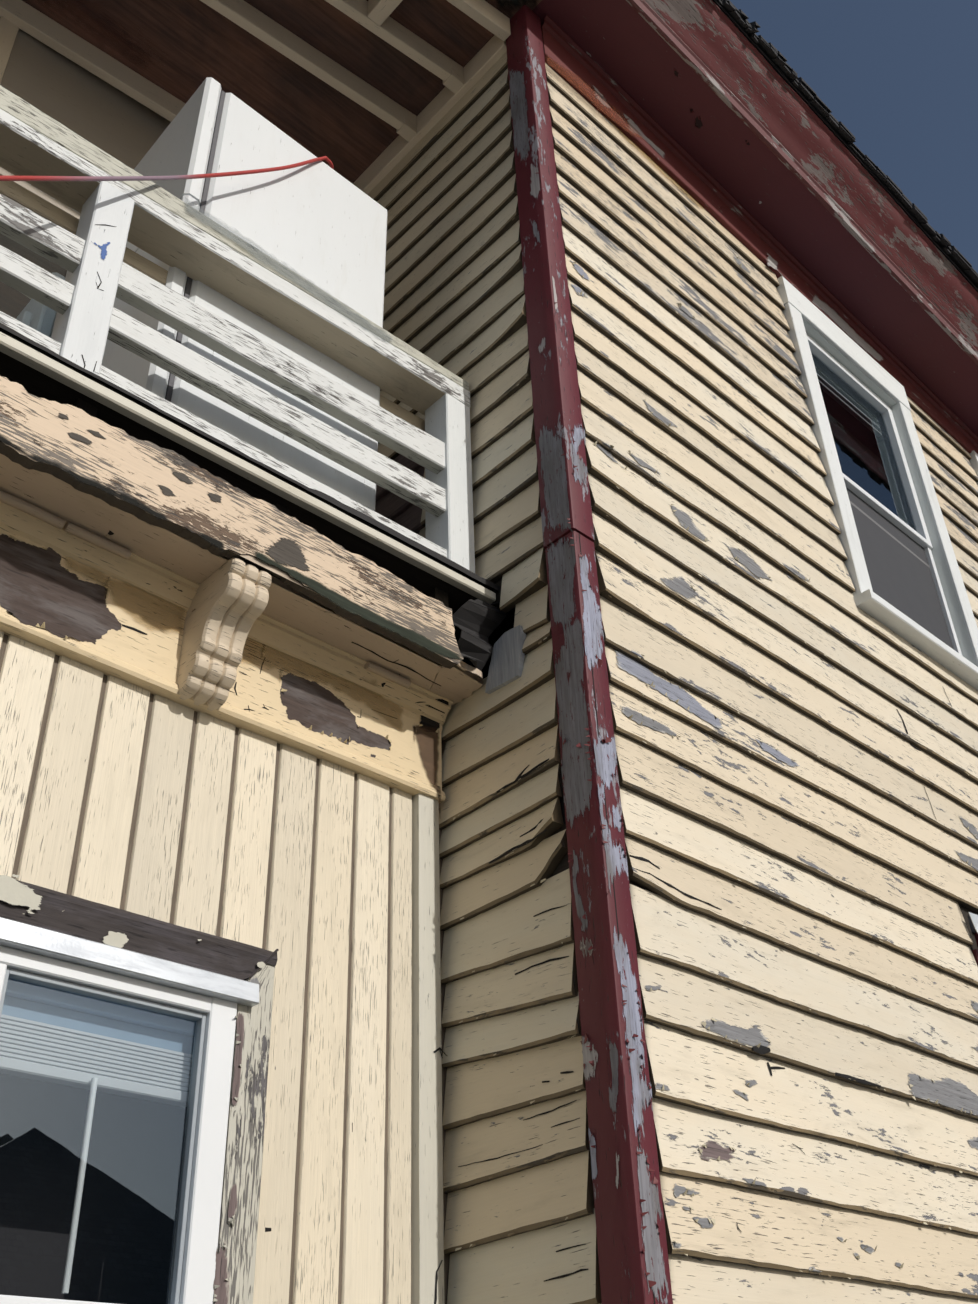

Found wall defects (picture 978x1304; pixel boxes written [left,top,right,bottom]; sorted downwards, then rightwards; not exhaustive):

peeling [813,296,883,361]
spalling [0,534,122,644]
peeling [539,423,722,893]
spalling [280,673,392,758]
crack [630,855,722,910]
peeling [232,1012,244,1106]
peeling [702,1017,771,1048]
peeling [581,926,716,1302]
peeling [908,1072,978,1116]
peeling [228,1184,238,1227]
peeling [213,1241,230,1304]
crack [434,1260,443,1304]